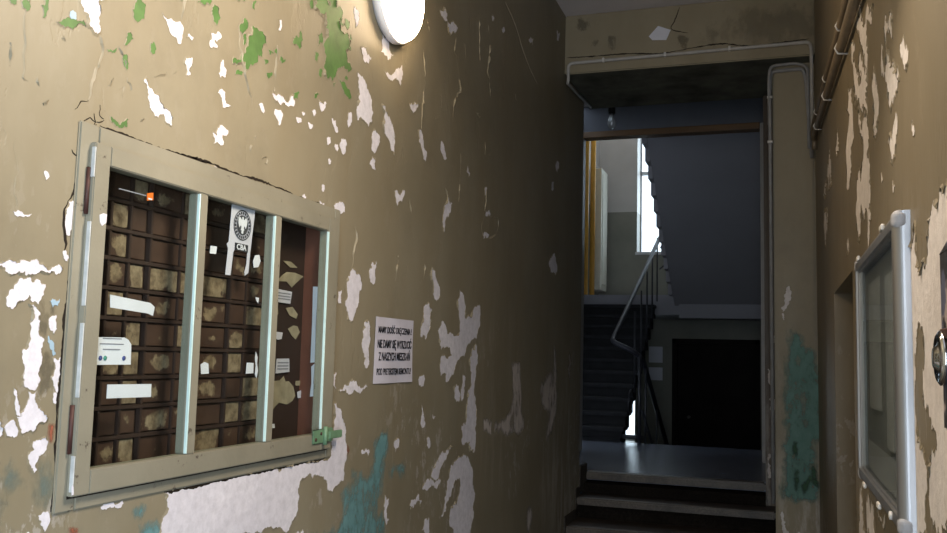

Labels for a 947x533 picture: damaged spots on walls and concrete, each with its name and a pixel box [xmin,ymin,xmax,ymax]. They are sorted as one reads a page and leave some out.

peeling [21,0,107,37]
crack [62,183,75,251]
peeling [65,200,74,237]
crack [76,101,319,203]
peeling [258,6,403,170]
crack [569,7,807,58]
peeling [824,0,909,257]
peeling [0,249,70,476]
peeling [159,372,368,533]
peeling [337,261,377,370]
peeling [409,266,481,533]
peeling [908,180,947,533]